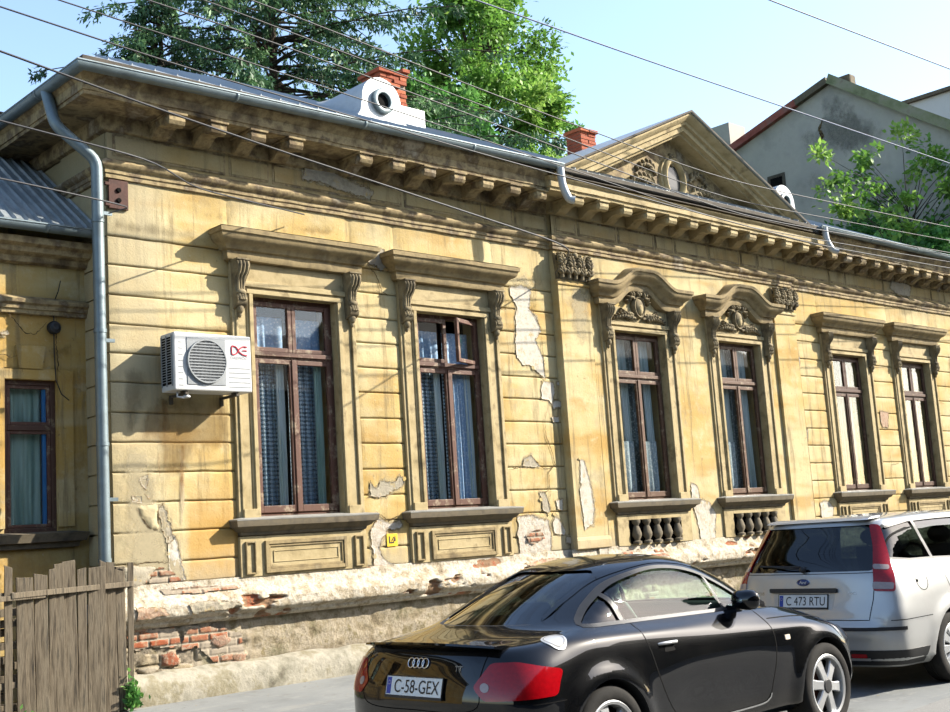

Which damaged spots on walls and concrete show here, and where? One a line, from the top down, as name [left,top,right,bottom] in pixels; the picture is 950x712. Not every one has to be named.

peeling [510,284,561,423]
flaking render [370,512,403,566]
flaking render [369,475,406,498]
flaking render [522,453,540,469]
flaking render [517,491,571,567]
peeling [578,457,597,530]
flaking render [599,544,671,558]
flaking render [690,483,717,539]
flaking render [126,503,245,663]